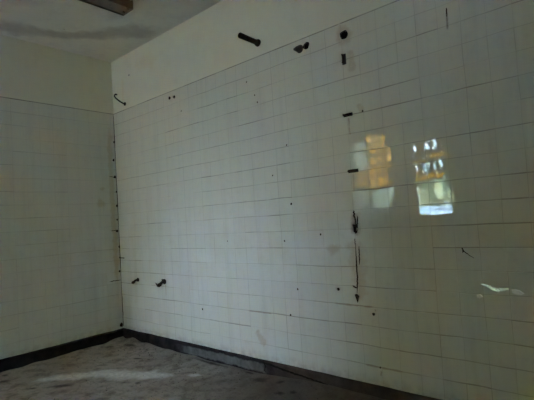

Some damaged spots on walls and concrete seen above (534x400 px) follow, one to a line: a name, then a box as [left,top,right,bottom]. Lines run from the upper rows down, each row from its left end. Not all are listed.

damp [0,9,162,43]
rust [321,237,377,312]